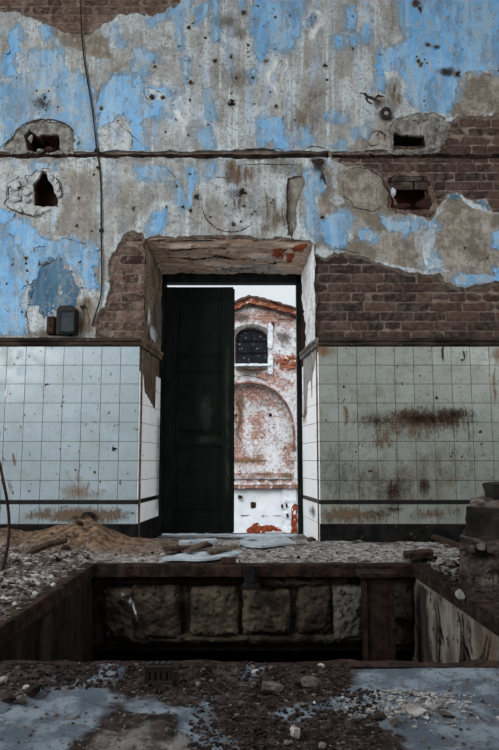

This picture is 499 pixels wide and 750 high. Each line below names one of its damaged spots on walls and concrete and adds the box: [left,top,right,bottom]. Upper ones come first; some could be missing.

spalling [0,0,499,416]
rust [364,408,475,447]